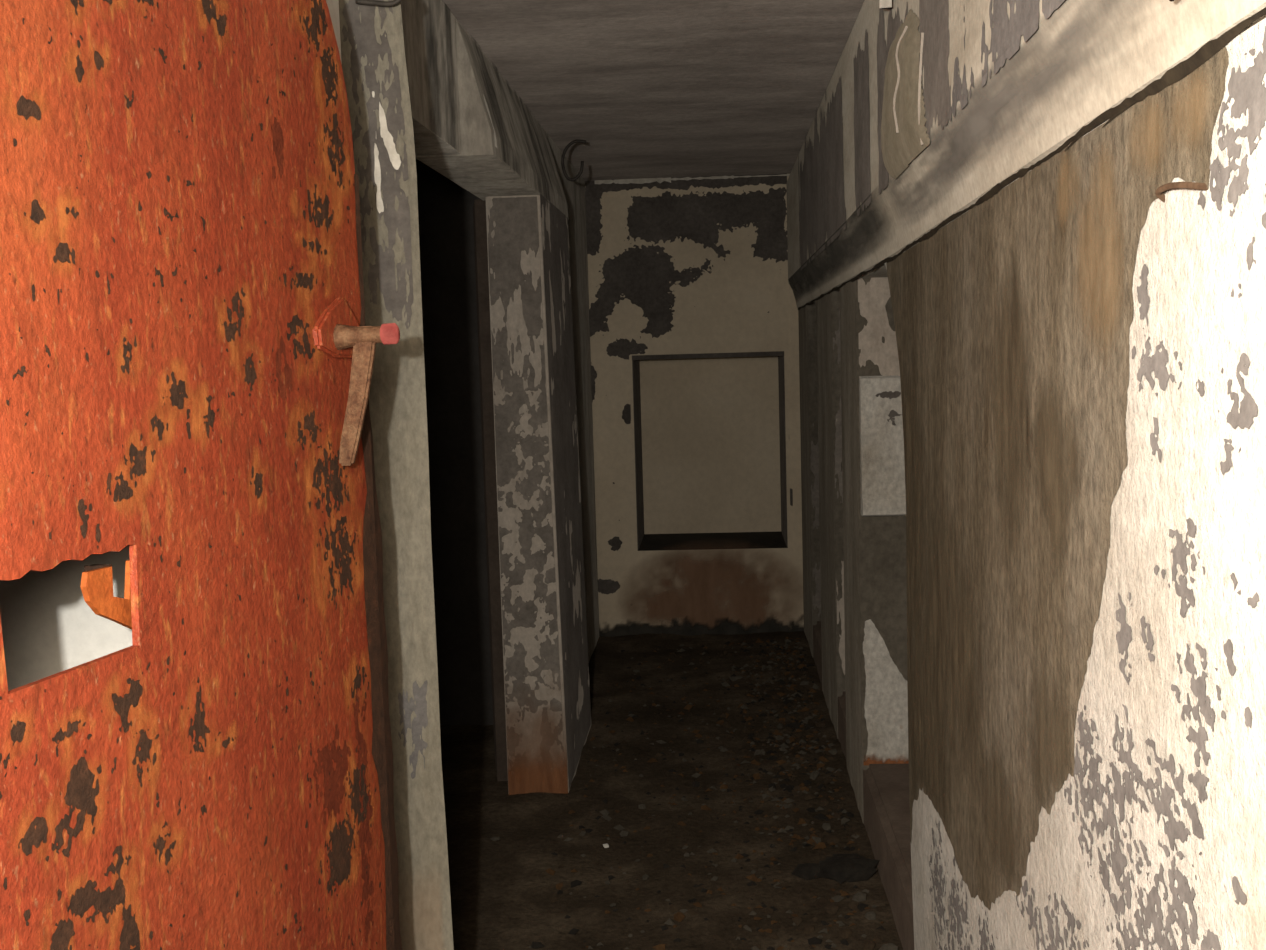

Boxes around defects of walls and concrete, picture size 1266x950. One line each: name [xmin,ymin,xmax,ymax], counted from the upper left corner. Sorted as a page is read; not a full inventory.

rust [16,95,41,120]
rust [251,0,354,255]
peeling [585,0,1065,364]
rust [106,309,315,502]
rust [276,410,358,634]
peeling [488,194,635,788]
water stain [599,617,804,637]
peeling [836,561,845,675]
spalling [858,26,1266,950]
rust [18,662,186,873]
rust [50,845,162,950]
rust [295,665,382,950]